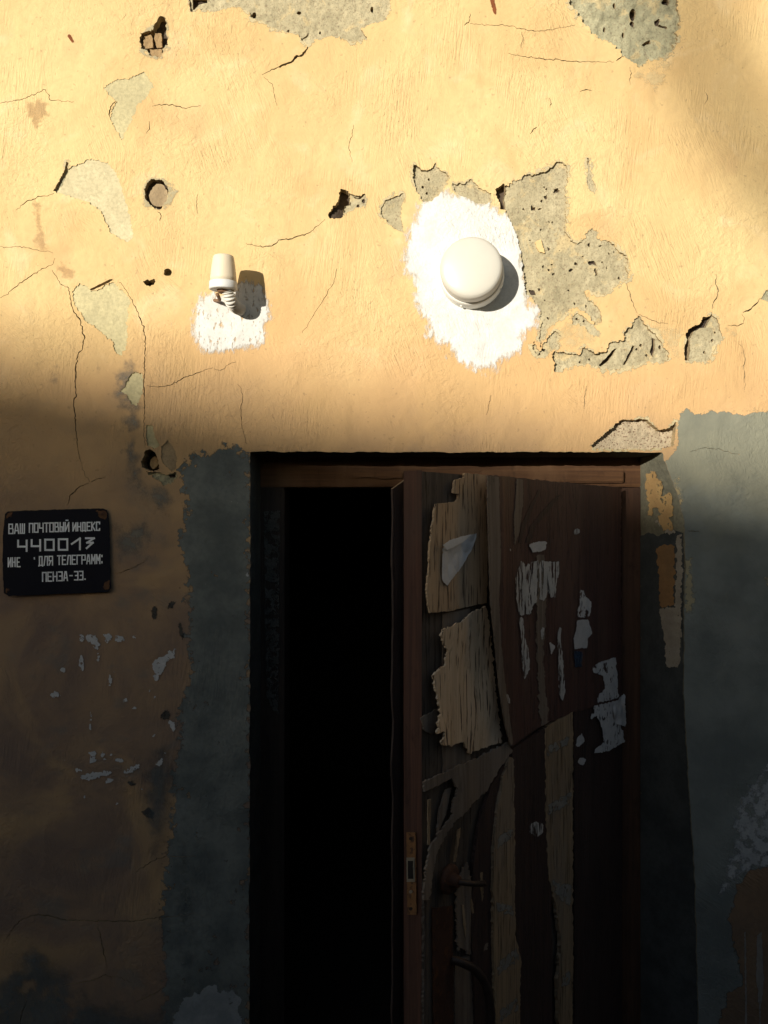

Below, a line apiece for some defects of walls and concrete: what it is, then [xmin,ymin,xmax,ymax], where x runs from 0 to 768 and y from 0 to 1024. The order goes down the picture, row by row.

spalling [139,16,168,57]
flaking render [187,0,392,47]
crack [465,14,632,81]
flaking render [565,0,683,67]
peeling [104,72,154,140]
peeling [53,159,134,242]
crack [246,221,323,247]
flaking render [328,157,671,375]
peeling [72,279,131,356]
flaking render [683,312,725,364]
flaking render [591,416,679,452]